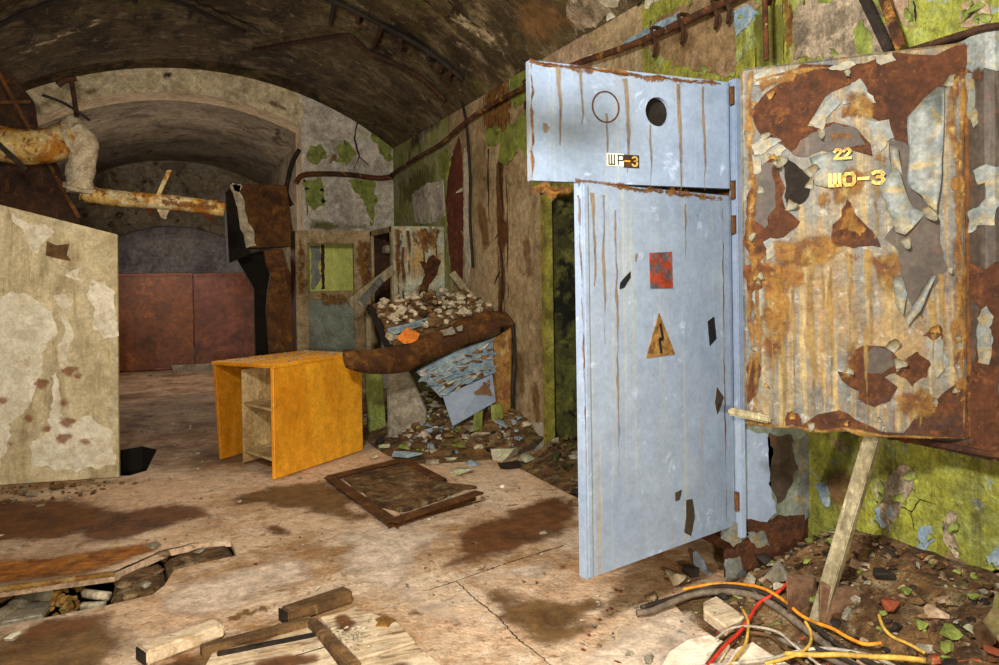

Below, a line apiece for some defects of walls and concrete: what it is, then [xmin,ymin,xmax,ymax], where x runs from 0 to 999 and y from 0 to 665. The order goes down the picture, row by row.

peeling [543,0,627,67]
peeling [624,0,762,78]
peeling [46,241,71,261]
damp [0,499,208,540]
damp [444,498,574,565]
peeling [984,546,999,576]
damp [480,563,601,644]